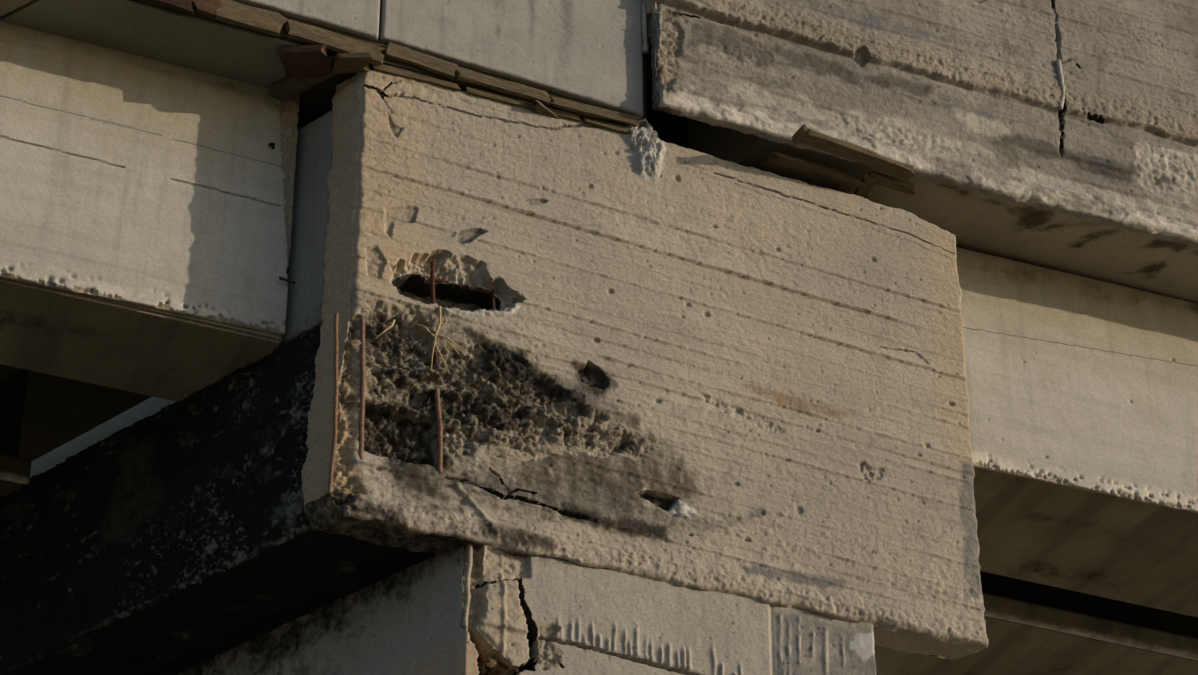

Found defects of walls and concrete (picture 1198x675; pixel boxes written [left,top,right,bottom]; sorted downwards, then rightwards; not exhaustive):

crack [363,82,587,130]
crack [1056,59,1105,153]
spalling [365,205,420,279]
spalling [457,227,489,244]
spalling [327,294,659,511]
crack [479,478,566,516]
spalling [637,489,681,511]
crack [475,578,699,675]